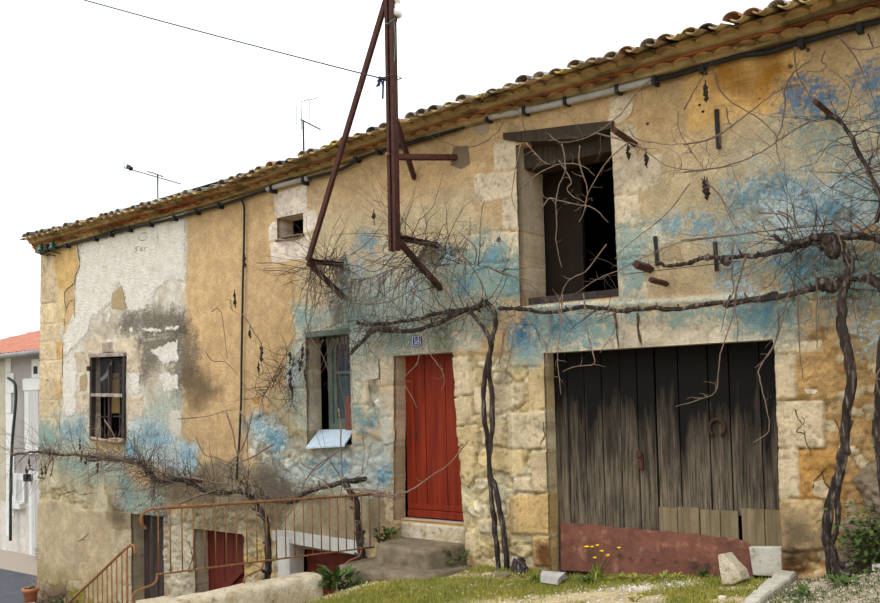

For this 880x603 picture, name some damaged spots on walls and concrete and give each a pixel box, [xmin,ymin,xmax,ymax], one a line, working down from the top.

peeling [60,204,191,419]
damp [38,303,216,525]
flaking render [168,406,193,446]
spalling [811,479,829,499]